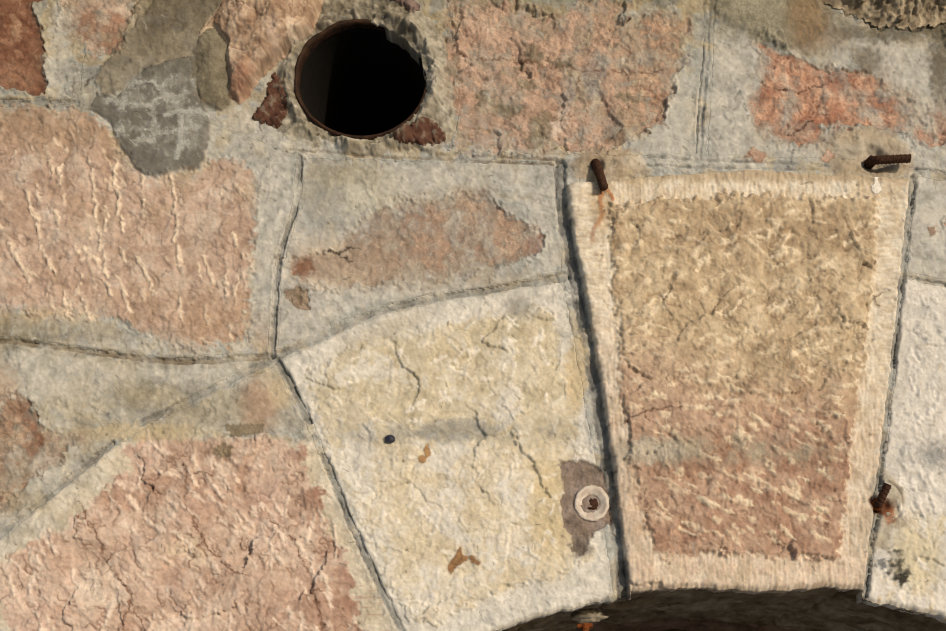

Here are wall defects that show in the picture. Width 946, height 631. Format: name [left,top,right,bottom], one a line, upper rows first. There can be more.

rust [419,444,431,463]
crack [76,501,146,631]
crack [186,507,246,575]
crack [270,521,325,631]
rust [448,547,480,573]
rust [870,498,894,520]